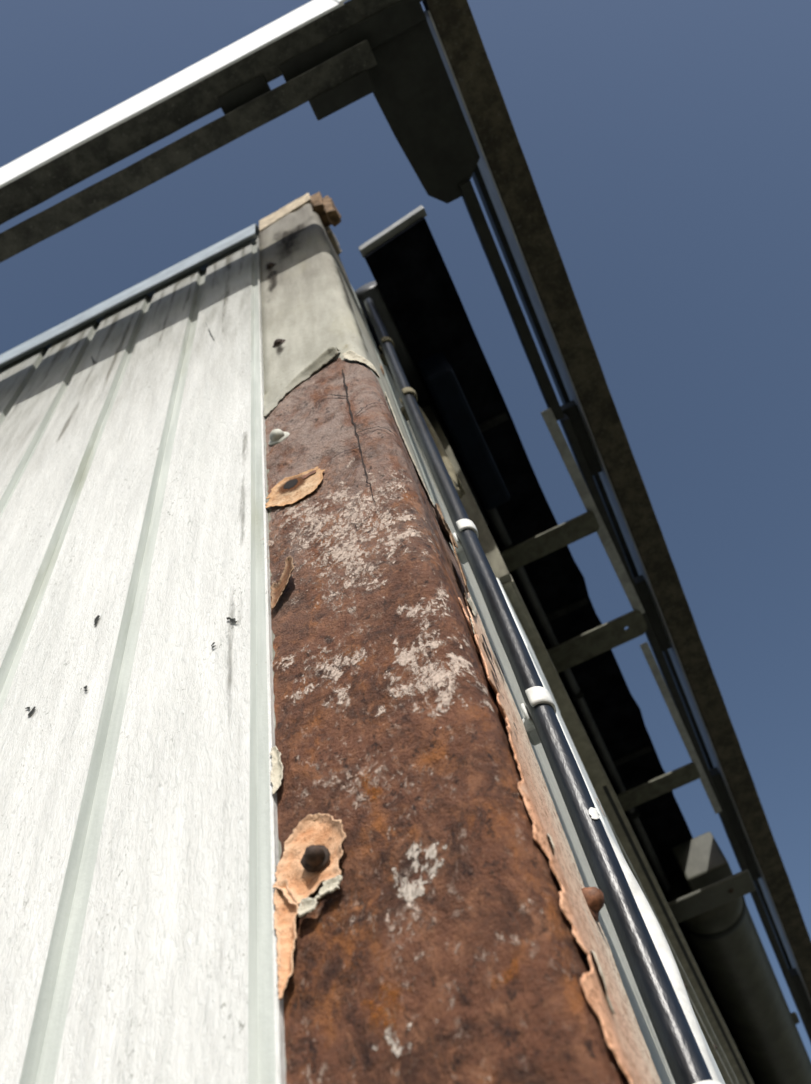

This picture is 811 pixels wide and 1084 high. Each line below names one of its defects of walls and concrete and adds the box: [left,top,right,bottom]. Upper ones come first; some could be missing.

peeling [265,466,325,508]
peeling [263,346,385,417]
corrosion [265,358,630,1084]
peeling [385,392,662,1084]